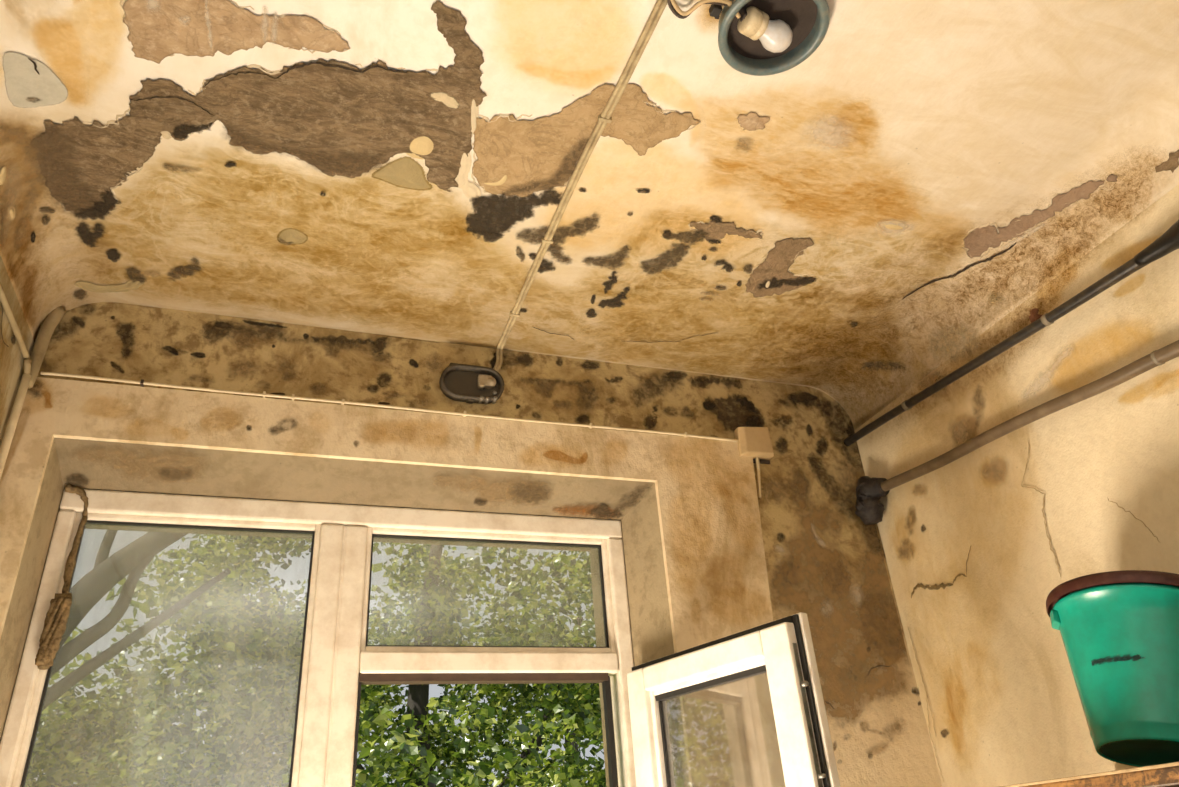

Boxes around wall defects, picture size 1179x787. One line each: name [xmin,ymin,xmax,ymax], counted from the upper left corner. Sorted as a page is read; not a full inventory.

peeling [3,52,68,108]
flaking render [30,0,702,214]
peeling [1155,150,1179,173]
mould [75,191,121,262]
mould [462,182,629,318]
mould [641,216,763,300]
peeling [746,237,816,298]
mould [162,320,398,405]
mould [490,353,623,423]
water stain [634,372,865,516]
crack [1021,442,1061,577]
crack [911,547,971,598]